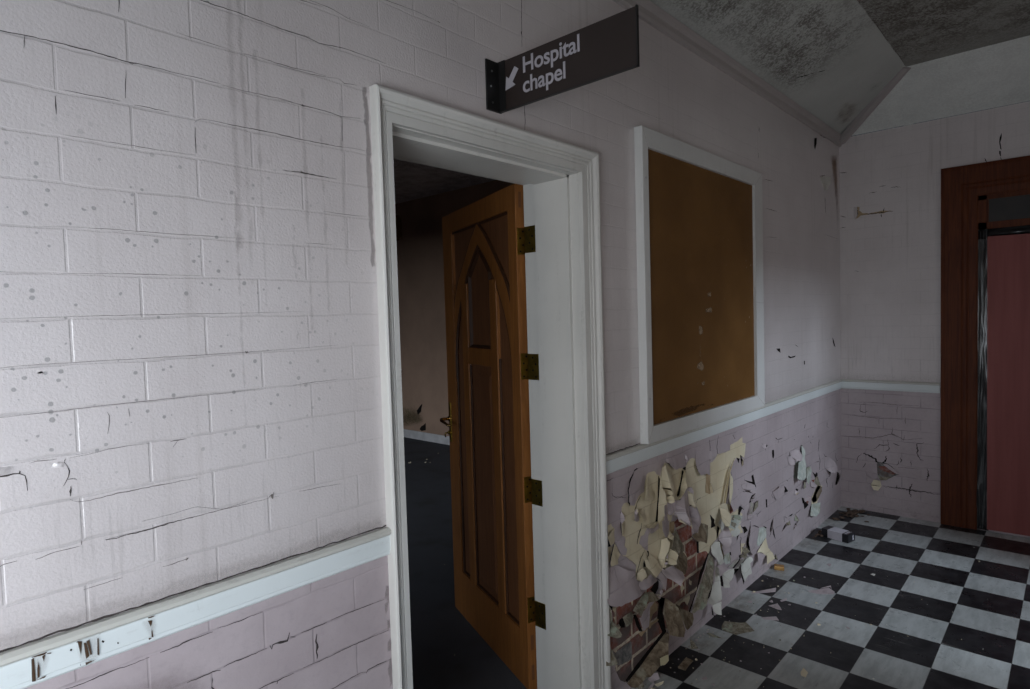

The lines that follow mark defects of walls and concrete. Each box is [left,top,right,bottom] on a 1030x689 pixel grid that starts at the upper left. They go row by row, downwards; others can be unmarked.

peeling [606,436,841,689]